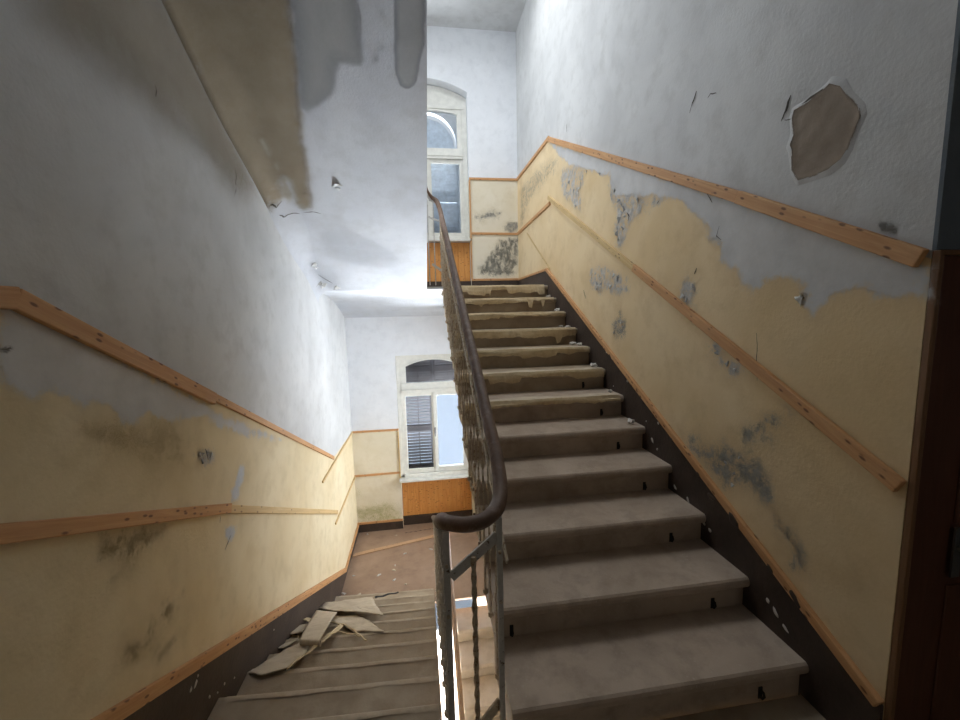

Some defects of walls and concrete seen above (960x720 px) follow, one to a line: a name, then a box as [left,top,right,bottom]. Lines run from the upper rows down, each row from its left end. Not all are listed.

damp [161,0,426,218]
damp [473,152,558,278]
peeling [550,143,941,320]
spalling [781,76,867,186]